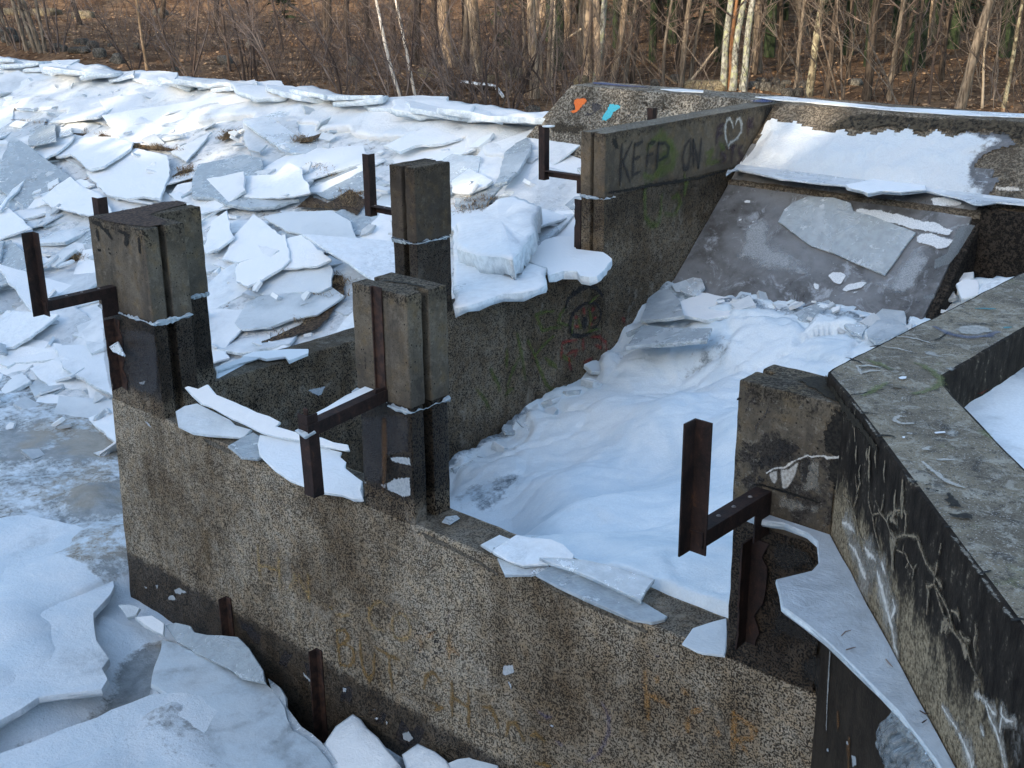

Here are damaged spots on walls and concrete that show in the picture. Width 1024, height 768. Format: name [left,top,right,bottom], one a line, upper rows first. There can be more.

crack [754,455,839,503]